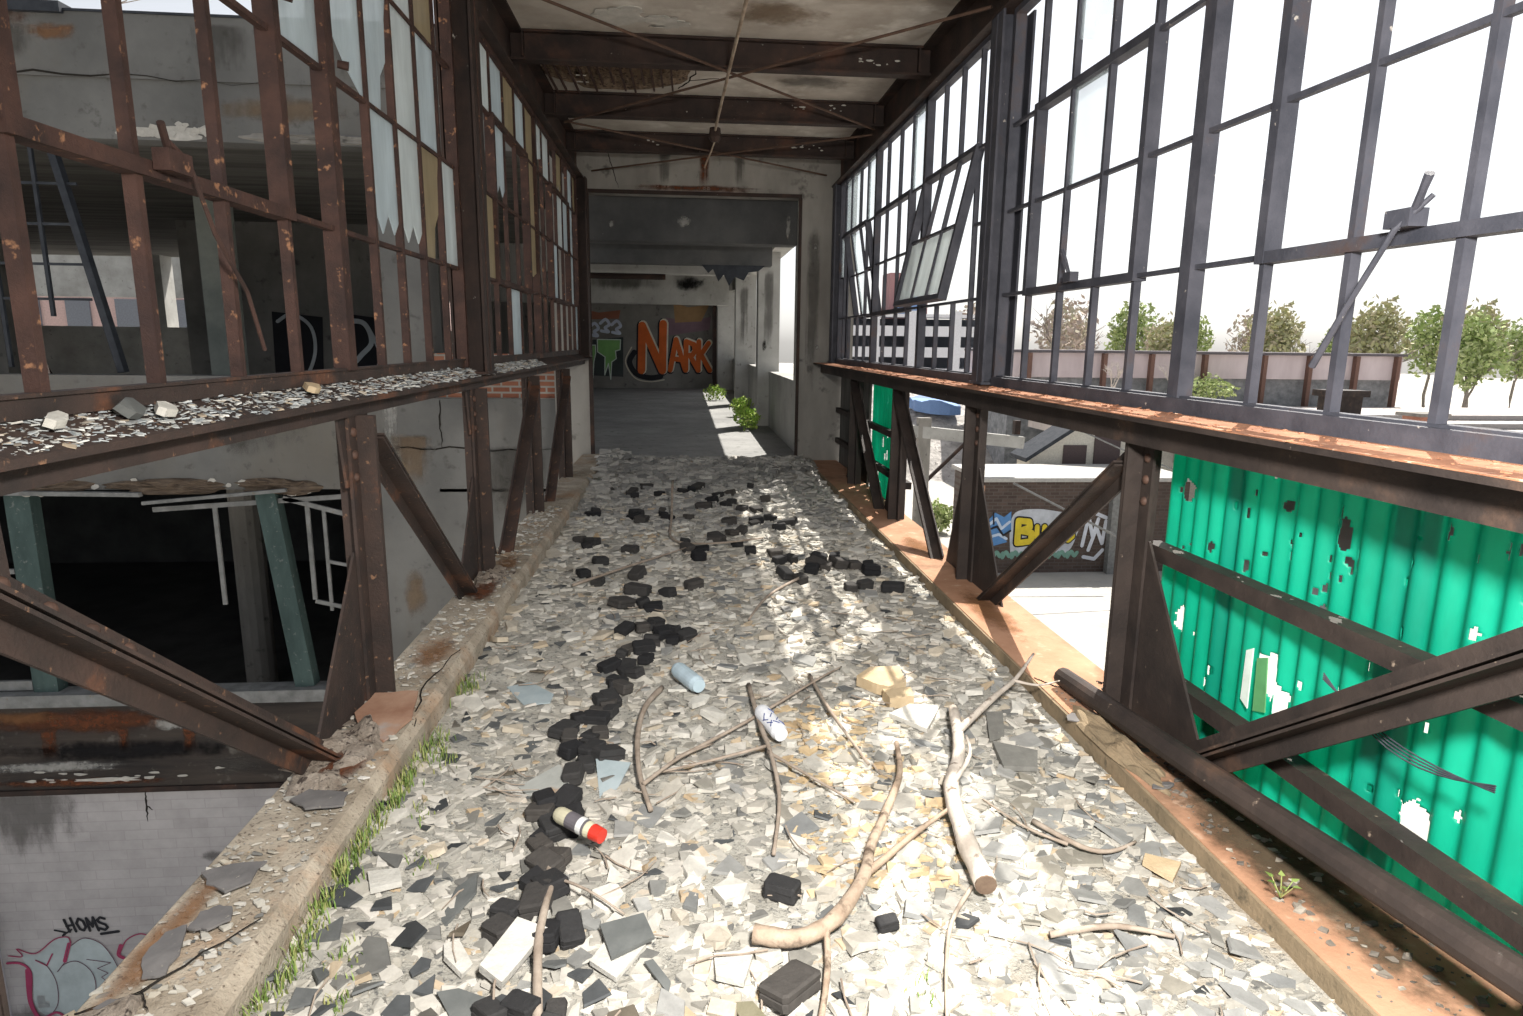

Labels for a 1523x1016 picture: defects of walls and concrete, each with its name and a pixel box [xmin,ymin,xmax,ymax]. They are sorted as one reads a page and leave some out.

water stain [734,5,807,23]
rust [1,710,164,753]